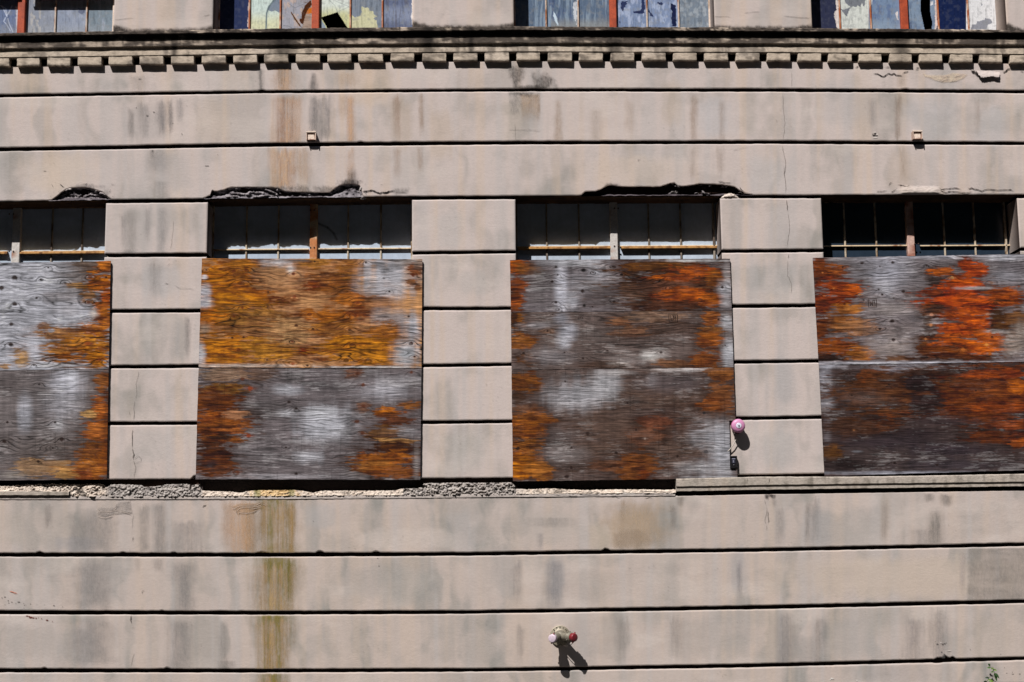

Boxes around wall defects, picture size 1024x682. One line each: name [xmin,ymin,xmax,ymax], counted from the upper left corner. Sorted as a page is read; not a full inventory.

peeling [971,69,1000,78]
leakage [264,500,293,585]
leakage [259,615,285,682]